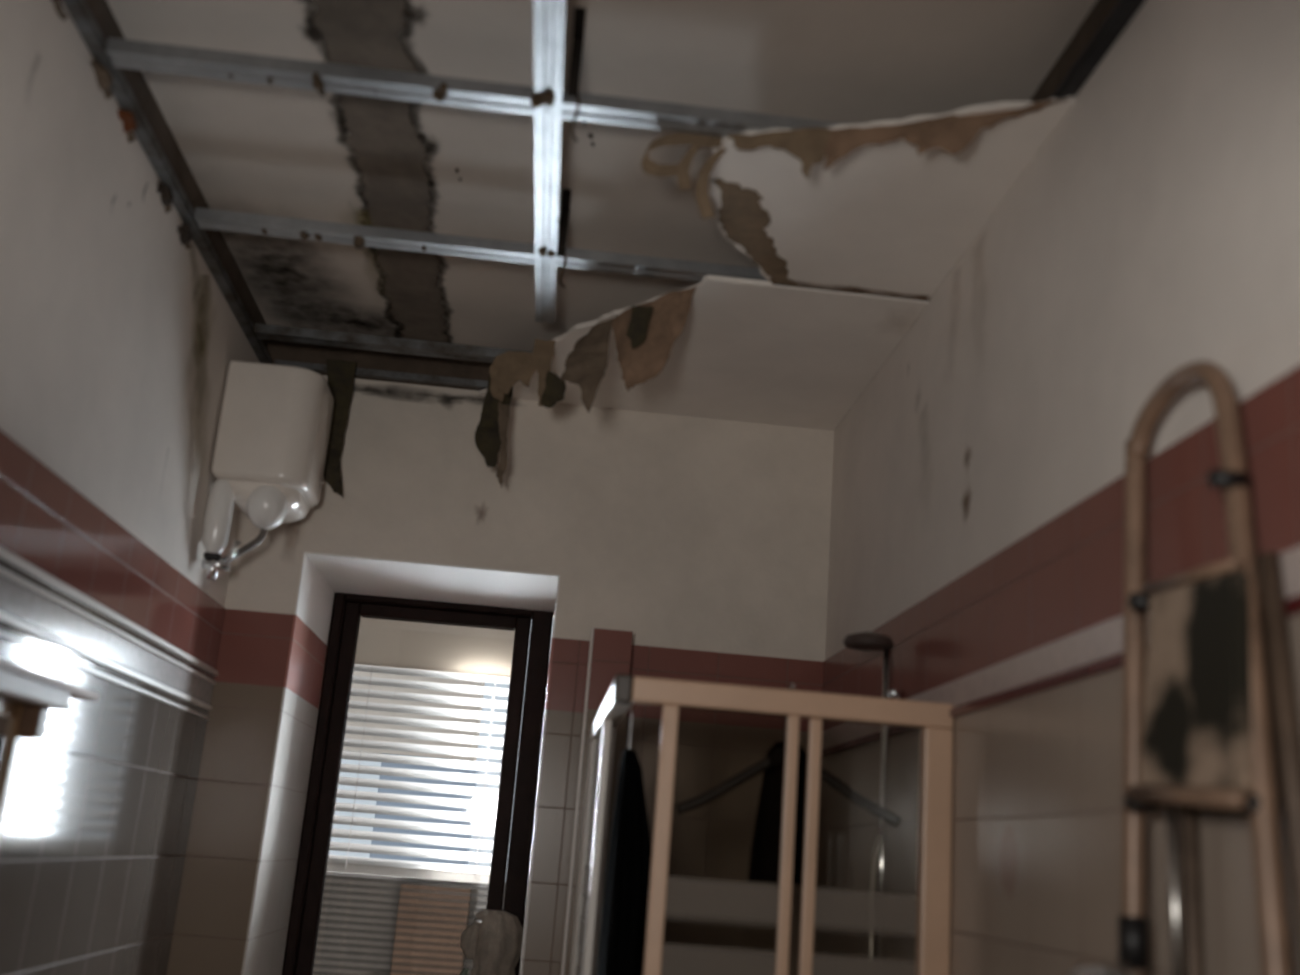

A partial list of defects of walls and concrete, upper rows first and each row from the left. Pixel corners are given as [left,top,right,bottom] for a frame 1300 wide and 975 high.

peeling [303,0,428,75]
flaking render [90,60,136,142]
flaking render [157,182,173,214]
flaking render [177,223,192,249]
peeling [331,93,437,233]
peeling [370,247,452,343]